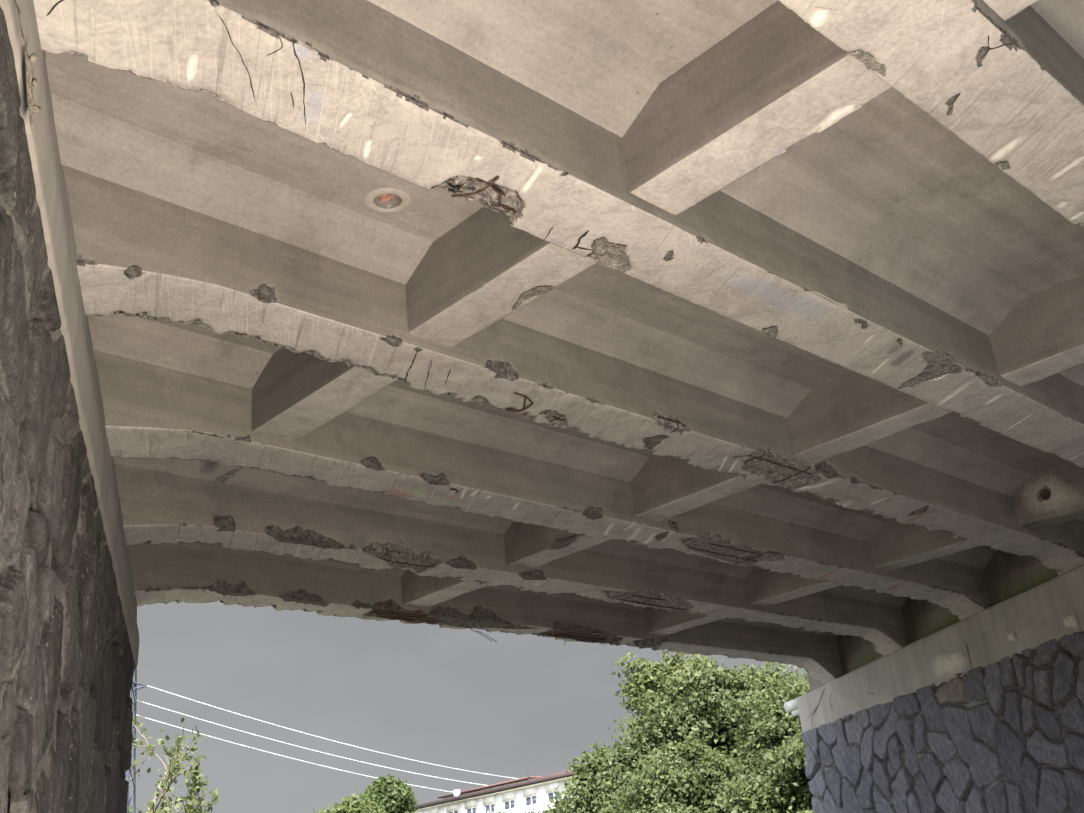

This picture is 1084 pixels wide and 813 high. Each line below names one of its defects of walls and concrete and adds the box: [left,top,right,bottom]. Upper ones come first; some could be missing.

crack [218,15,306,125]
spalling [976,47,990,67]
spalling [430,176,527,226]
spalling [585,238,633,273]
spalling [898,351,963,389]
spalling [730,448,840,489]
spalling [265,525,350,550]
spalling [364,540,477,573]
spalling [655,520,785,566]
spalling [351,599,663,651]